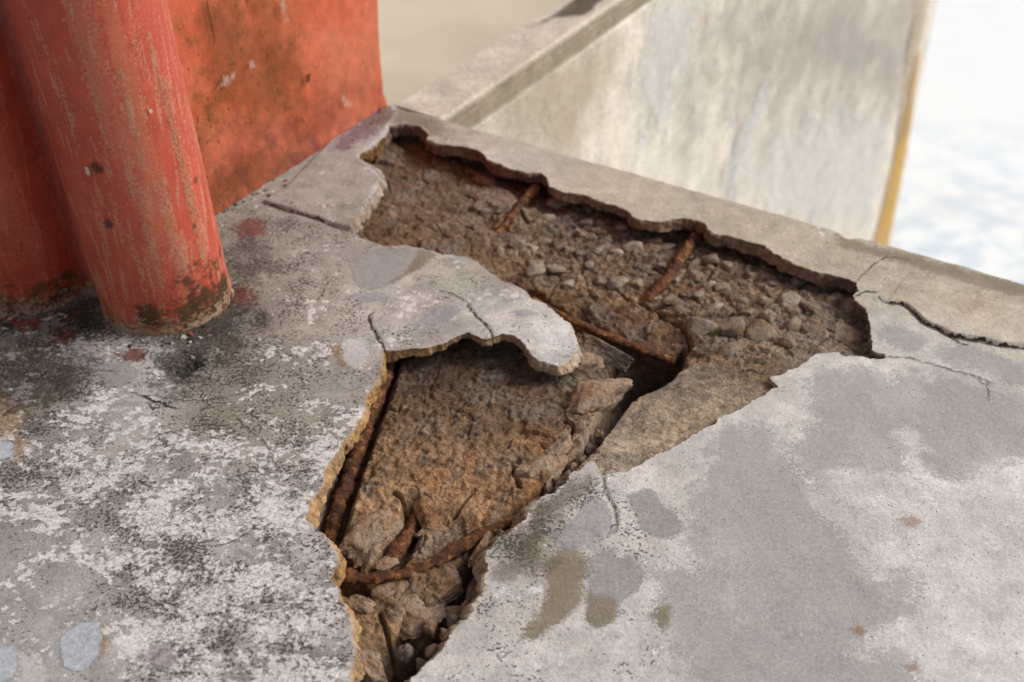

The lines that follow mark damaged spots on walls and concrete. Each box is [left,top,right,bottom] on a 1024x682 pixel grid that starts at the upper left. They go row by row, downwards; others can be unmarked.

crack [265,204,348,231]
corrosion [390,137,552,234]
crack [368,312,385,352]
crack [437,289,493,336]
corrosion [529,295,676,364]
crack [856,256,1024,349]
spalling [317,451,350,533]
corrosion [323,361,397,548]
corrosion [343,510,518,584]
spalling [336,135,870,682]
damp [523,489,721,639]
damp [682,369,936,682]